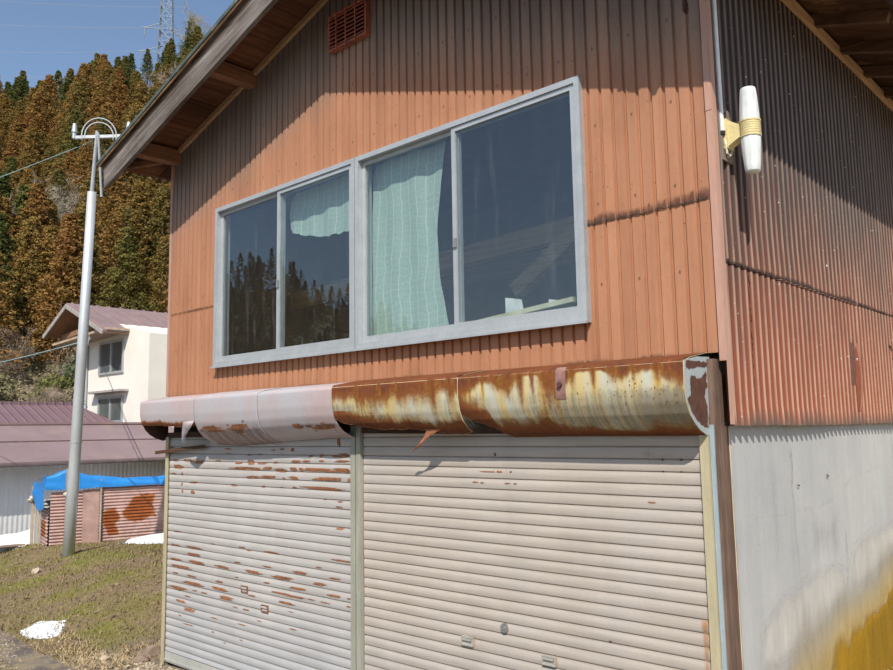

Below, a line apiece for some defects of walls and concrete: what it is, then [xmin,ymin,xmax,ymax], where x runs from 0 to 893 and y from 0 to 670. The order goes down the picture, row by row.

corrosion [332,352,706,437]
leakage [764,529,893,670]